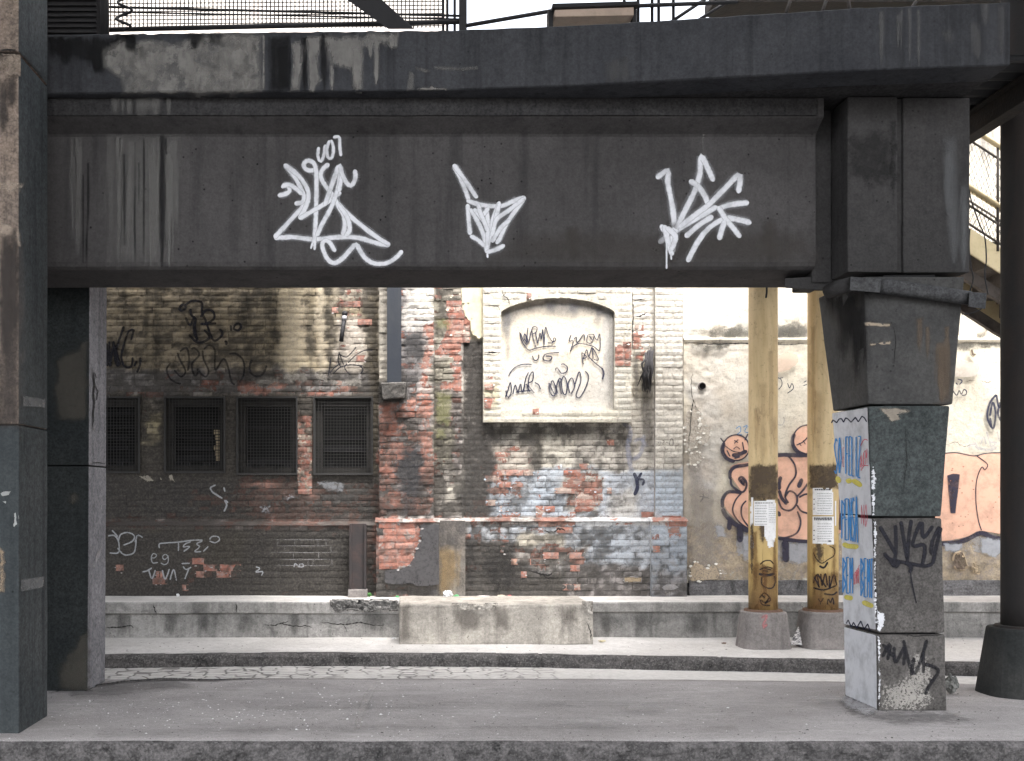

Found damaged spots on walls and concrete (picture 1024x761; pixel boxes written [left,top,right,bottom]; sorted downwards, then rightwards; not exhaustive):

damp [50,35,135,71]
damp [190,32,219,48]
damp [271,37,308,90]
damp [119,138,145,246]
peeling [446,288,483,343]
spalling [297,416,312,494]
peeling [484,470,535,488]
peeling [536,464,612,534]
peeling [378,521,439,586]
crack [267,621,383,631]
spalling [330,599,399,612]